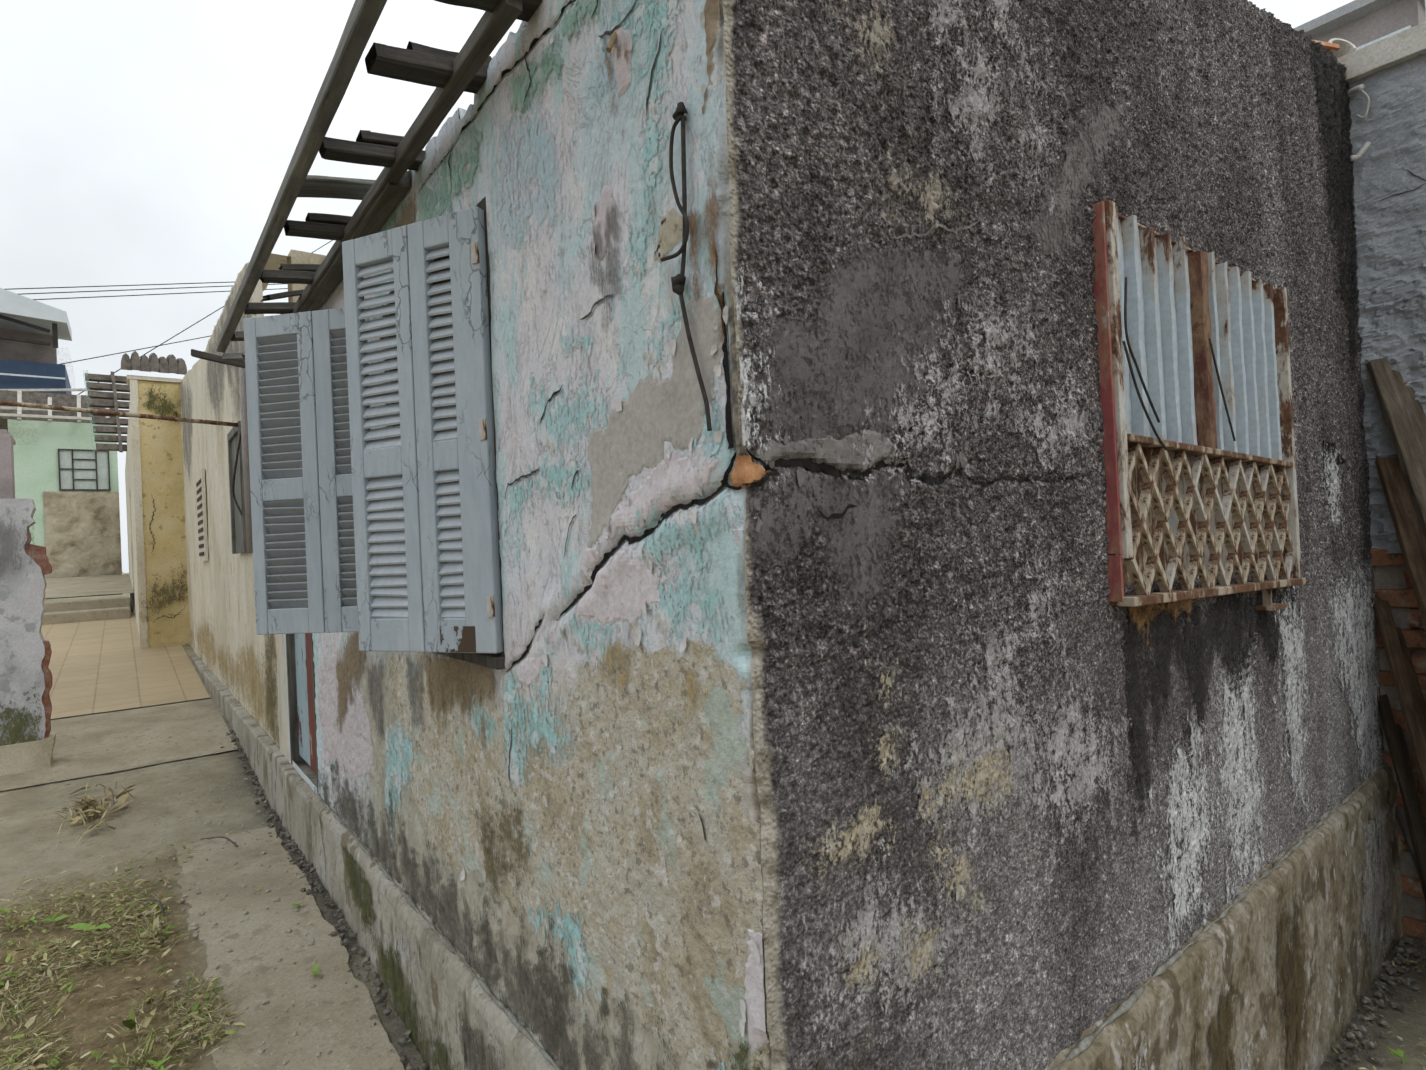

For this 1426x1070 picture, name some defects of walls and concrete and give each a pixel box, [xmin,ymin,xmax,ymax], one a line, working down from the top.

peeling [416,118,482,222]
peeling [504,0,701,381]
flaking render [700,0,720,114]
crack [1379,168,1426,201]
crack [505,249,734,672]
crack [764,370,1092,520]
leakage [314,753,676,1070]
flaking render [317,363,900,1070]
peeling [865,658,909,781]
leakage [773,524,1315,1070]
leakage [1326,557,1385,787]